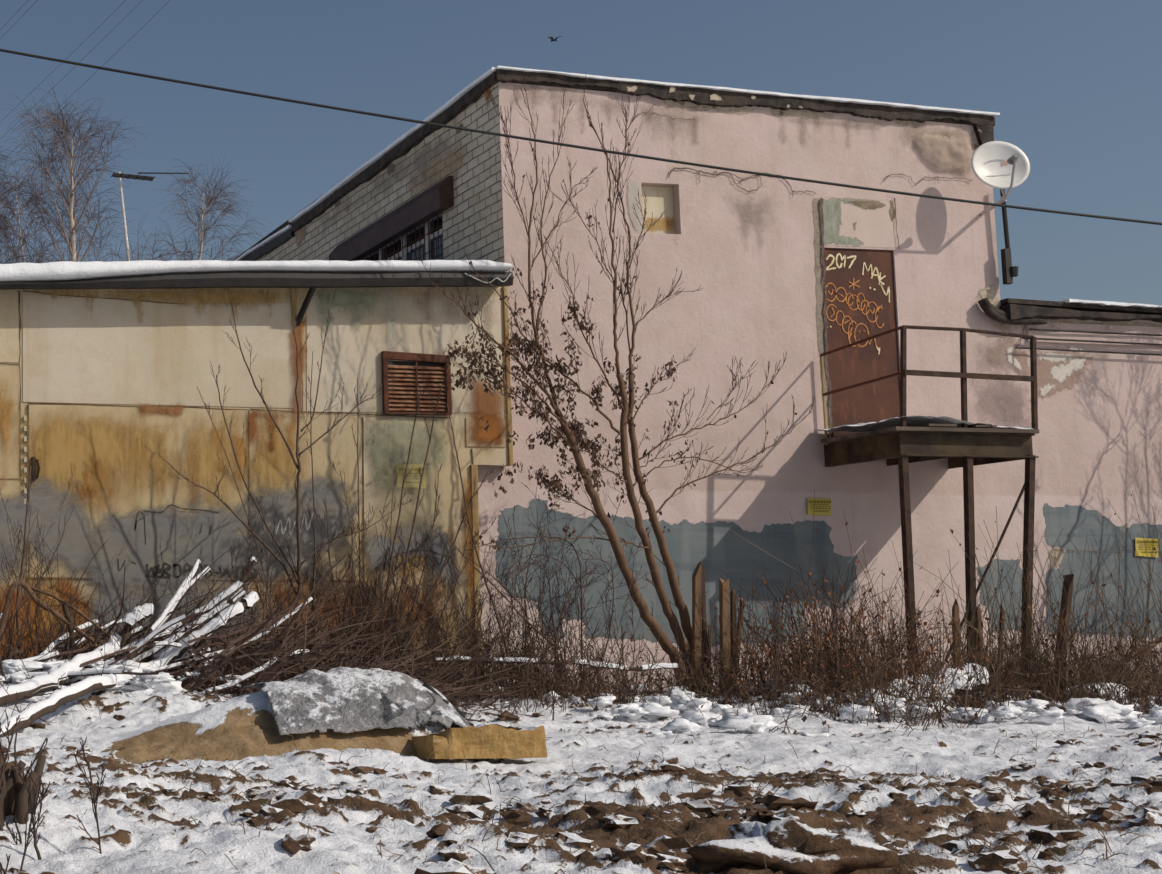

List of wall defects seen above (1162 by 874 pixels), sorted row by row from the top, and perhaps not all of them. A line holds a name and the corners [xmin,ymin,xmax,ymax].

peeling [821,197,895,248]
crack [884,174,972,249]
crack [668,167,834,437]
corrosion [189,321,306,505]
corrosion [471,380,504,445]
peeling [1007,344,1092,401]
corrosion [26,405,183,505]
corrosion [0,580,91,661]